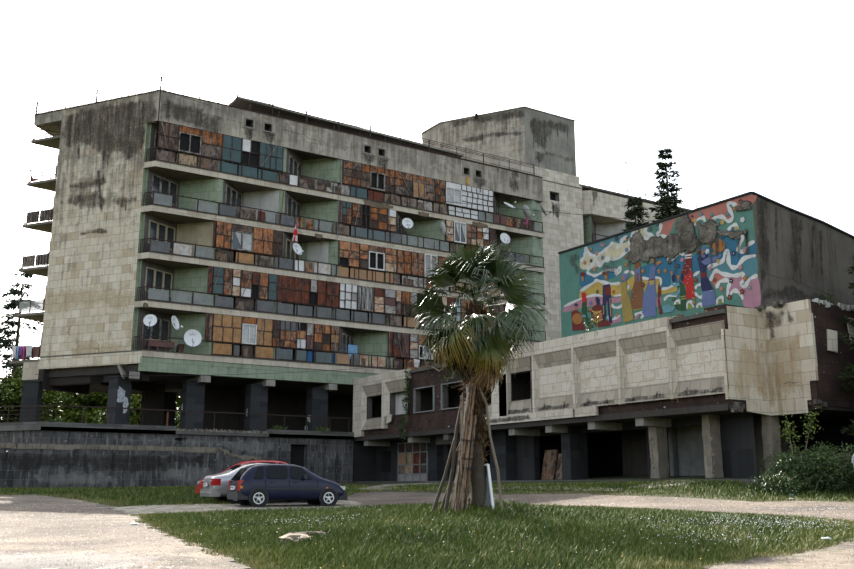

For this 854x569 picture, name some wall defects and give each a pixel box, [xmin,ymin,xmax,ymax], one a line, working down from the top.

leakage [63,99,218,210]
leakage [454,110,568,161]
peeling [626,214,749,272]